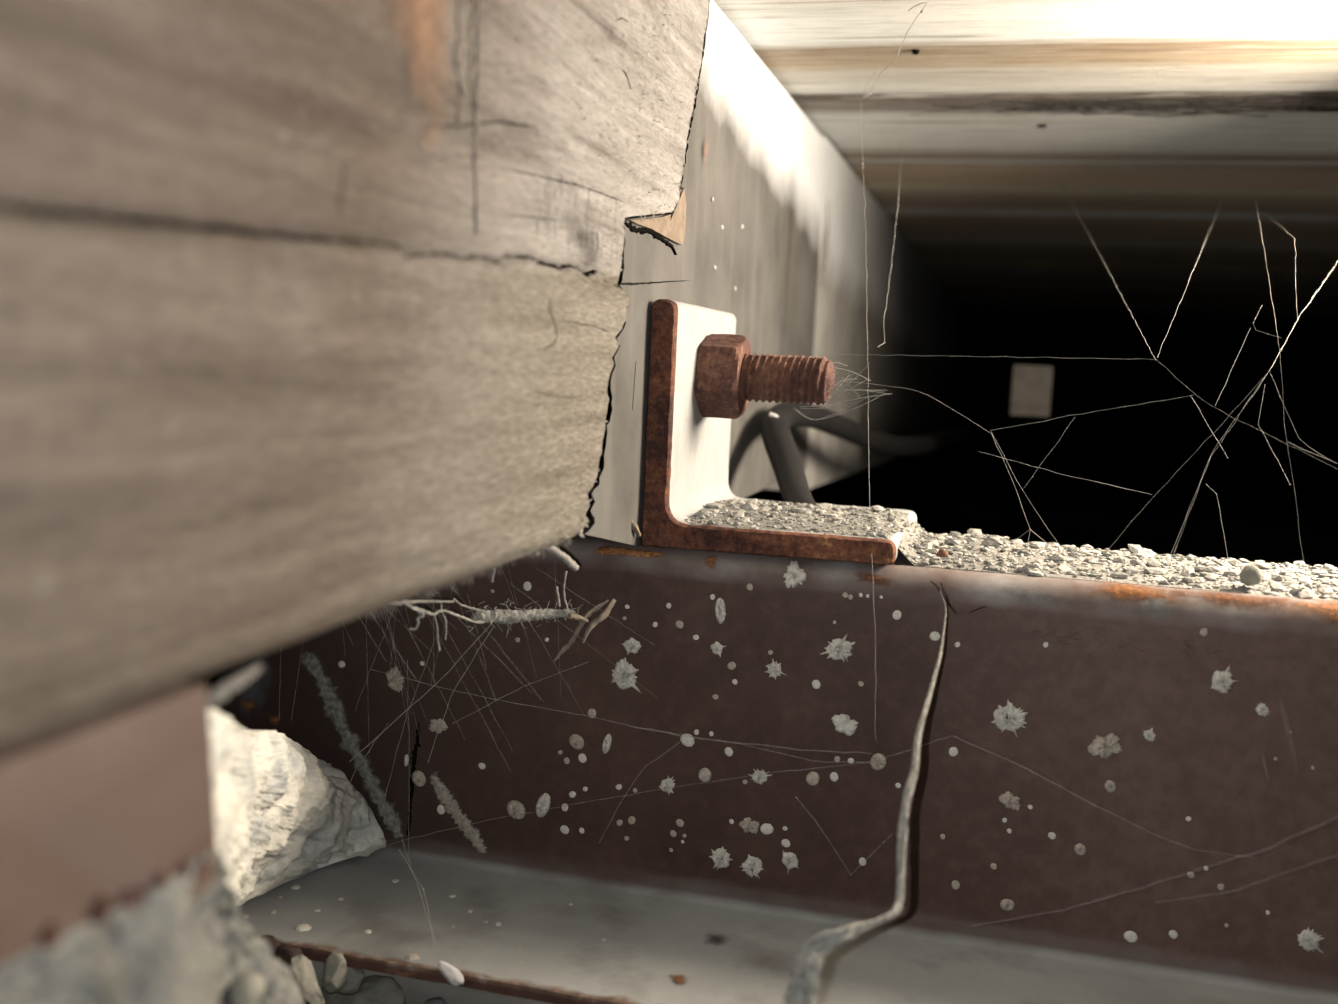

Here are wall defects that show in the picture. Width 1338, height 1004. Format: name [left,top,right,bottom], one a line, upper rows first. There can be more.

crack [0,168,691,349]
corrosion [1101,582,1338,623]